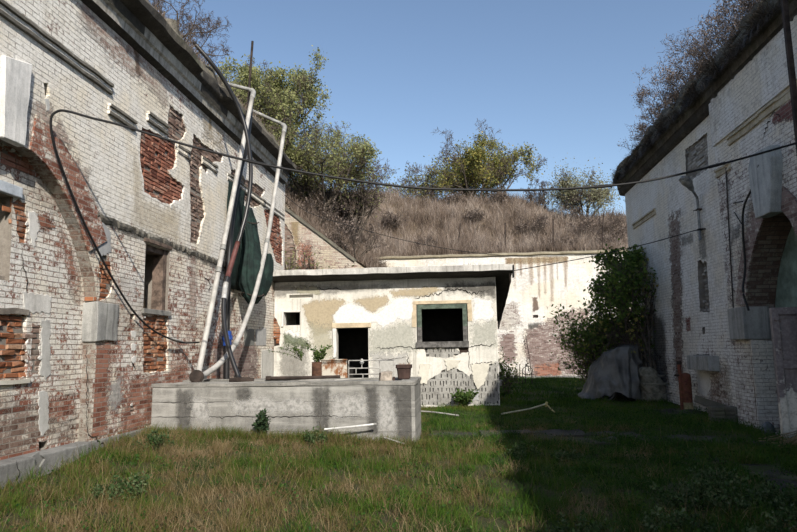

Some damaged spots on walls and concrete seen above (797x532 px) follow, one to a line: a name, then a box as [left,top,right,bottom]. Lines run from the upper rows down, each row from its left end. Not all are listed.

peeling [26,86,102,211]
flaking render [75,0,227,328]
flaking render [230,168,317,270]
flaking render [0,147,189,438]
peeling [302,298,345,358]
peeling [355,286,441,312]
crack [416,286,490,299]
peeling [667,208,691,385]
leakage [177,392,209,431]